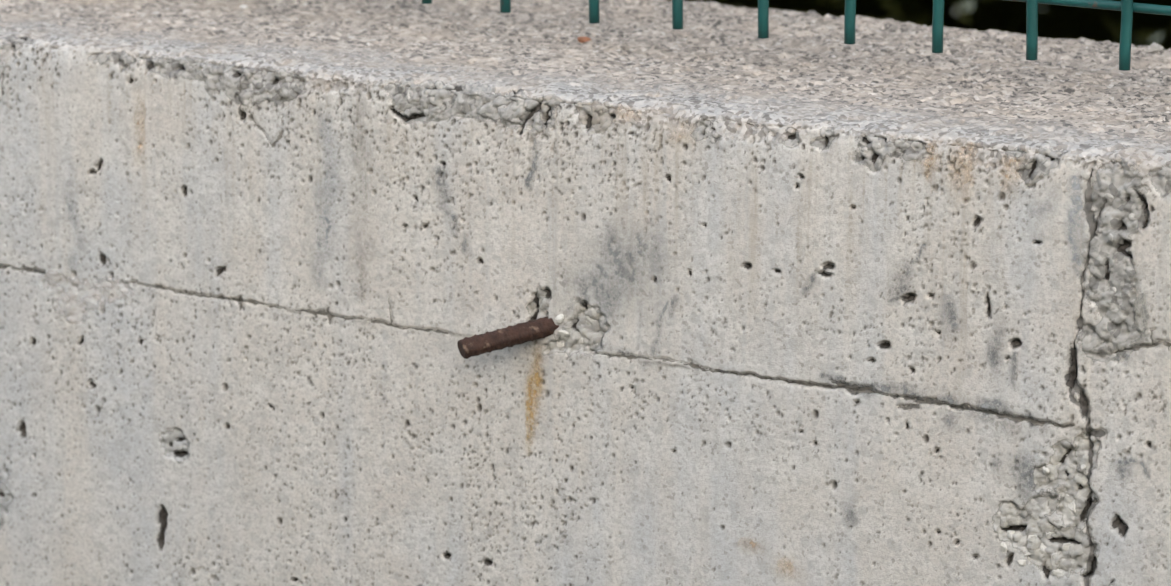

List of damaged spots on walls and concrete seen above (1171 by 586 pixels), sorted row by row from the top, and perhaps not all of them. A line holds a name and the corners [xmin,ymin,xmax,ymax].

crack [1133,188,1148,228]
crack [0,265,45,273]
spalling [1078,159,1171,362]
crack [131,281,448,334]
spalling [457,287,610,359]
crack [1111,330,1171,355]
corrosion [526,372,541,437]
crack [592,170,1113,586]
spalling [993,433,1101,578]